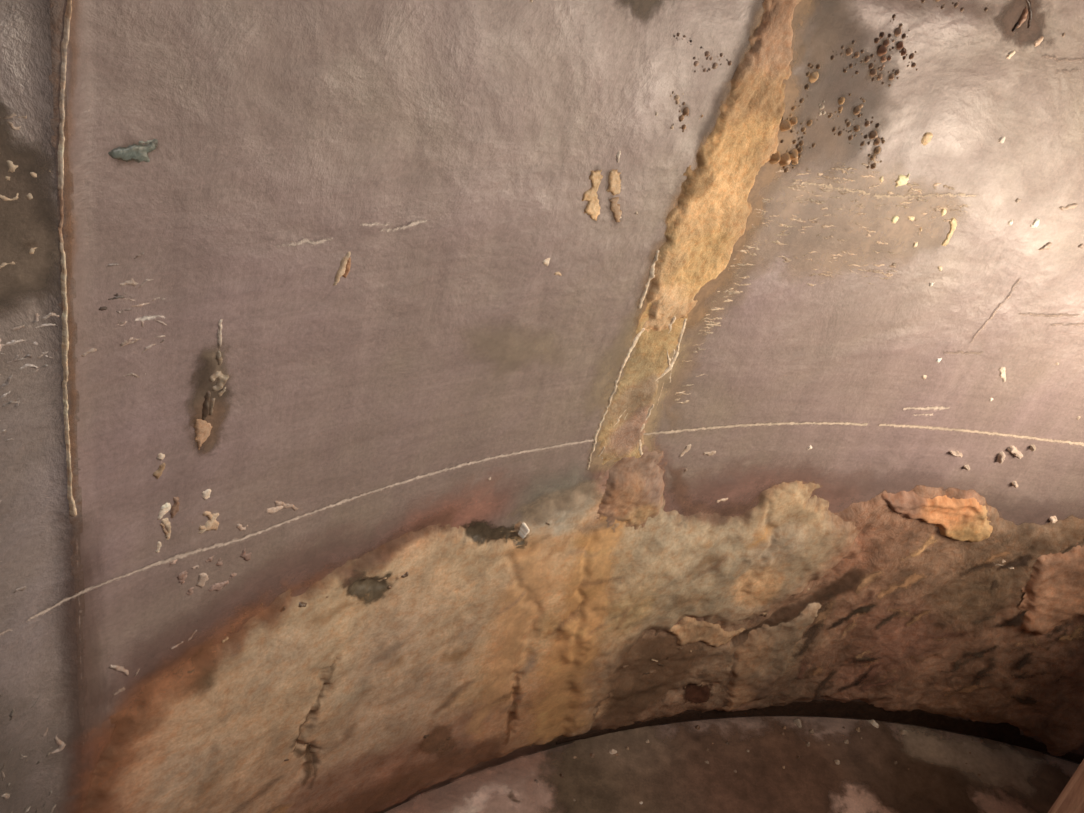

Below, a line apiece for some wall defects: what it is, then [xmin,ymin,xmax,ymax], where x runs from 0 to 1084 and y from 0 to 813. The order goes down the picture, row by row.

leakage [0,104,60,313]
peeling [108,139,158,163]
peeling [582,151,622,223]
corrosion [587,0,918,470]
peeling [997,445,1036,464]
crack [464,521,526,549]
peeling [518,523,530,539]
crack [344,570,392,604]
corrosion [79,469,1084,813]
crack [294,695,320,780]
leakage [474,718,1072,813]